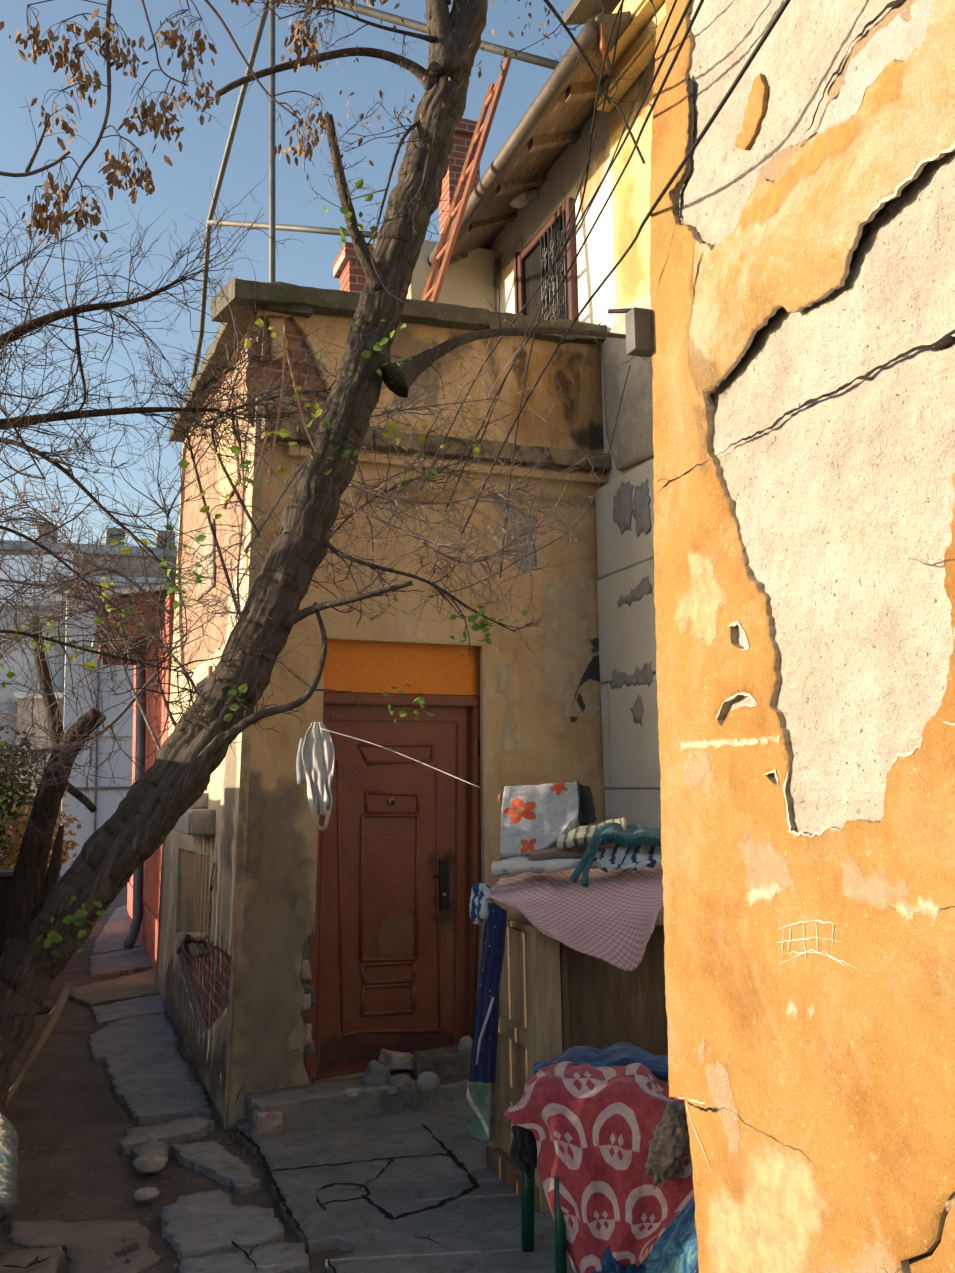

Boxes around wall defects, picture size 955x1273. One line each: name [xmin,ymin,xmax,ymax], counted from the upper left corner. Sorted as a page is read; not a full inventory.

spalling [674,0,935,247]
damp [555,351,604,450]
spalling [676,141,955,837]
spalling [177,940,232,1041]
crack [678,1097,817,1172]
crack [879,1196,955,1273]